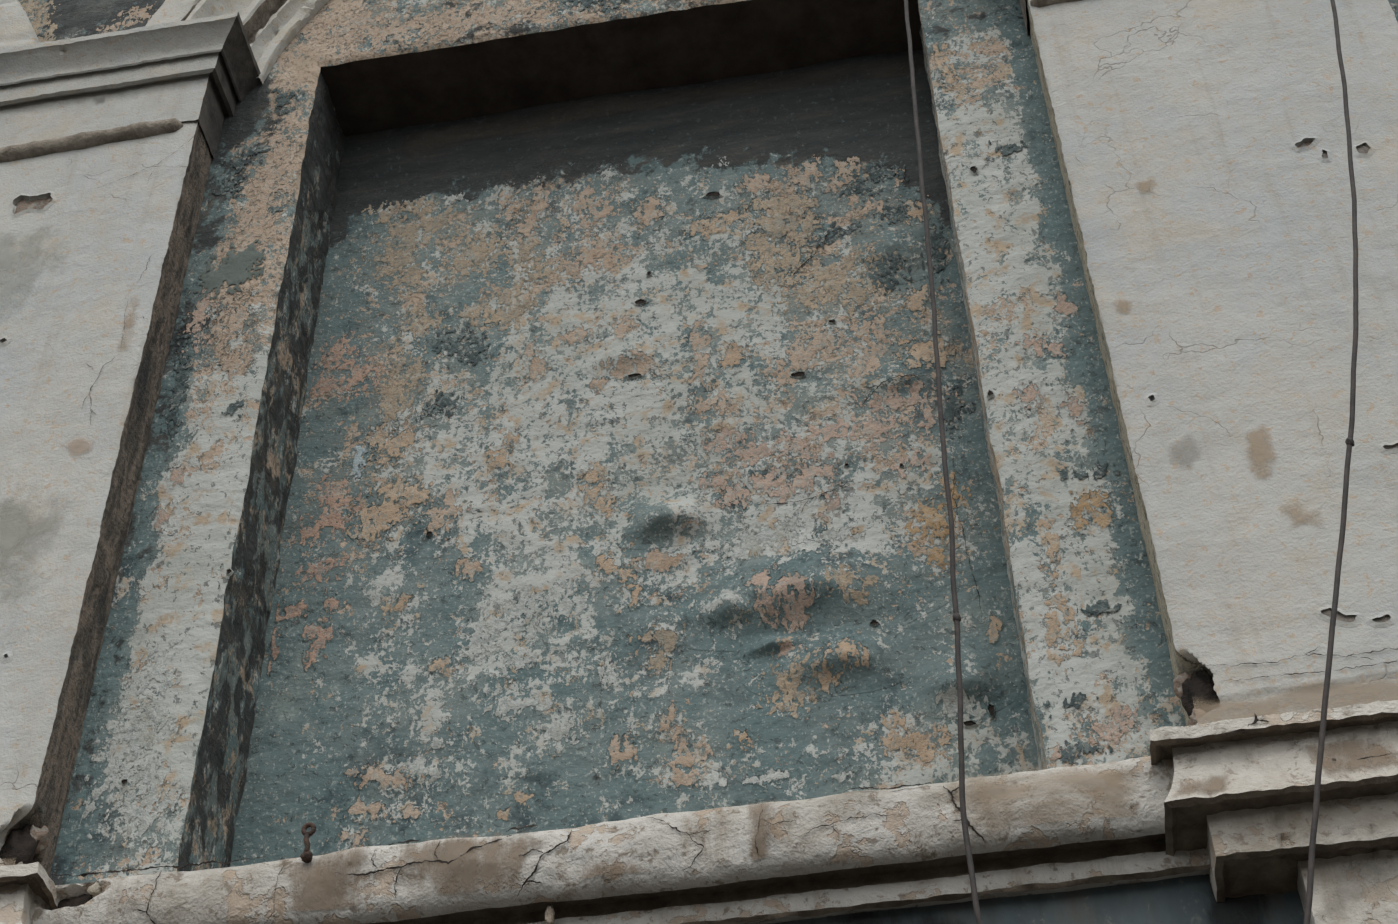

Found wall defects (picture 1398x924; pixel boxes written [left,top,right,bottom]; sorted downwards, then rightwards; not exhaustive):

peeling [302,0,579,55]
peeling [221,115,302,263]
peeling [1009,289,1091,431]
peeling [267,154,991,795]
peeling [1036,483,1119,675]
spalling [0,824,49,865]
peeling [79,638,193,847]
peeling [323,737,454,850]
crack [335,824,575,899]
crack [644,816,709,871]
crack [755,782,985,864]
spalling [1173,669,1220,726]